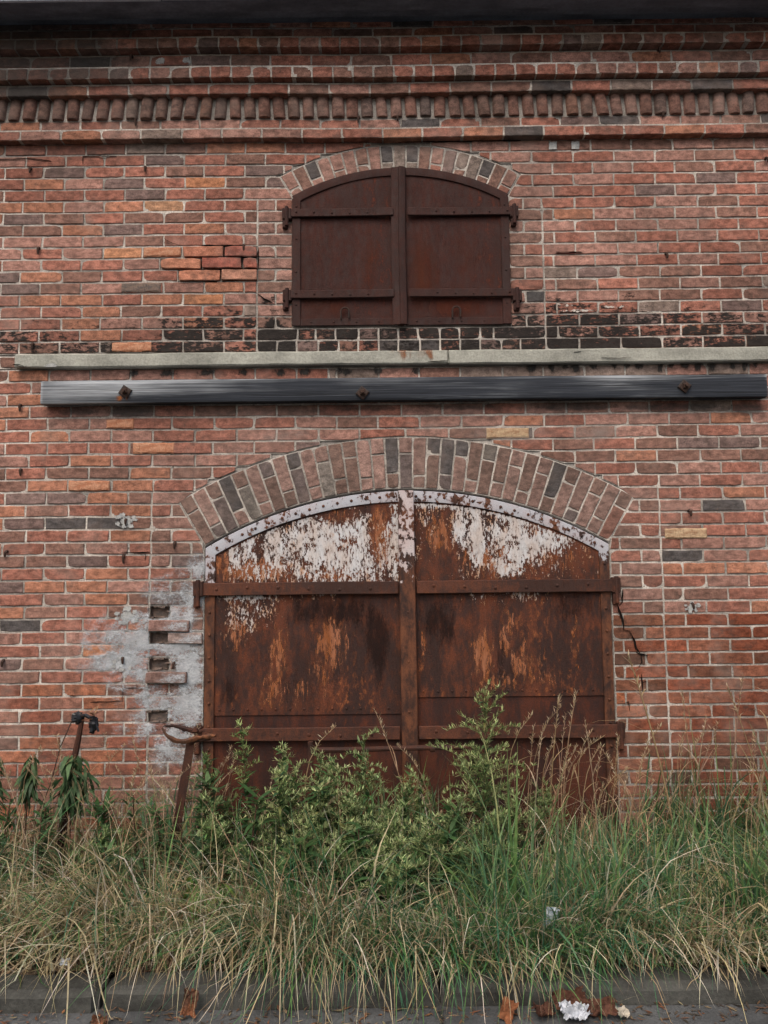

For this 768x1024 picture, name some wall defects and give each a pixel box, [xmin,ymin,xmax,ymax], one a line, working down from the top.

corrosion [216,552,289,582]
peeling [217,504,399,641]
corrosion [301,563,369,581]
corrosion [369,508,392,568]
corrosion [426,512,574,578]
peeling [414,503,599,580]
spalling [149,606,170,619]
spalling [150,632,170,644]
spalling [149,657,171,670]
corrosion [263,601,388,706]
corrosion [471,610,556,690]
crack [618,590,648,711]